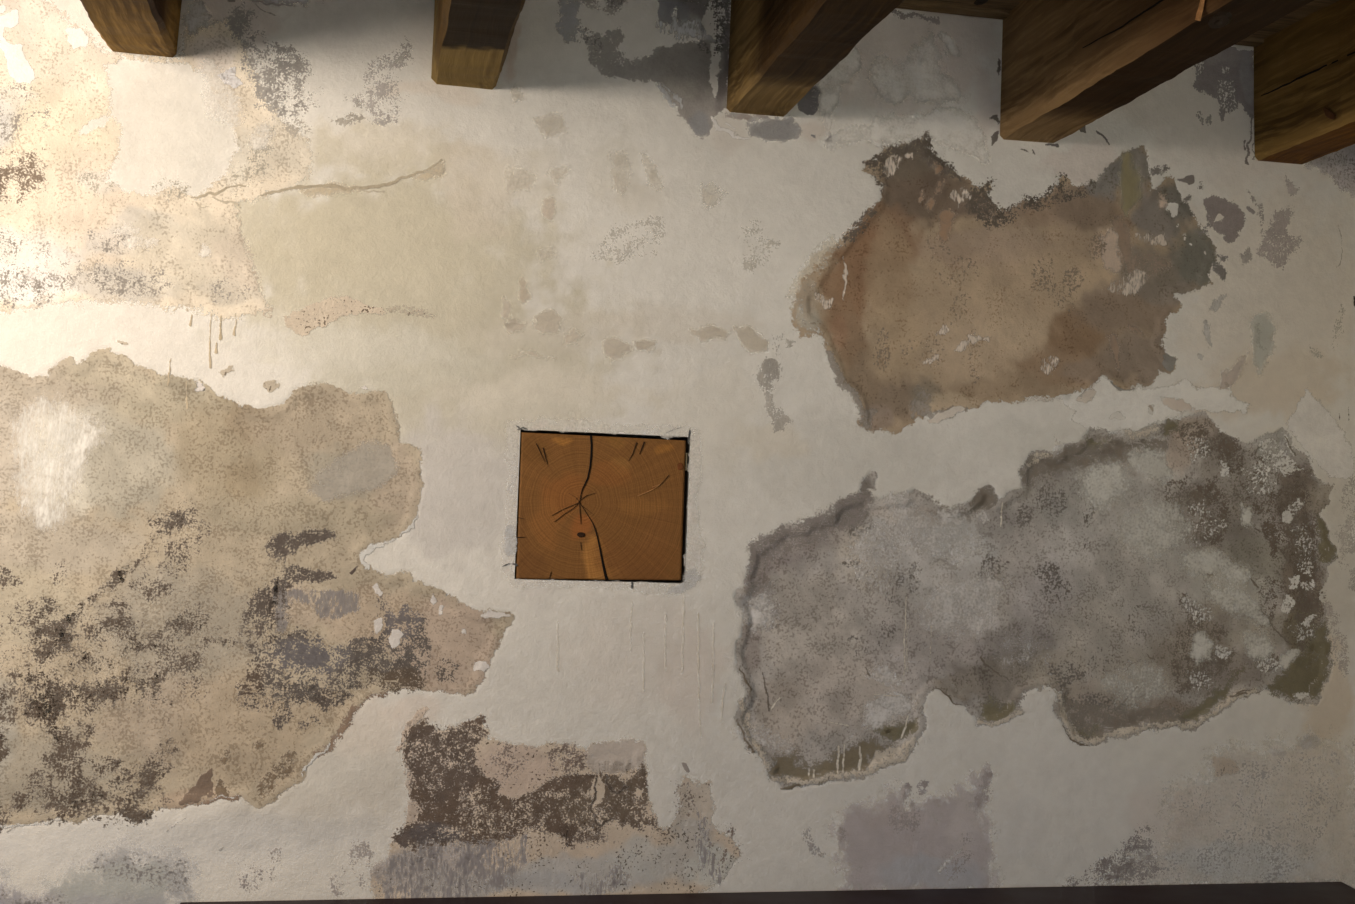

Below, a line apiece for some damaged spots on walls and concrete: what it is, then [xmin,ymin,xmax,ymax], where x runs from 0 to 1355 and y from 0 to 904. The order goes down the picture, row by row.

peeling [555,0,832,144]
crack [191,159,445,208]
spalling [0,340,515,833]
peeling [368,713,750,899]